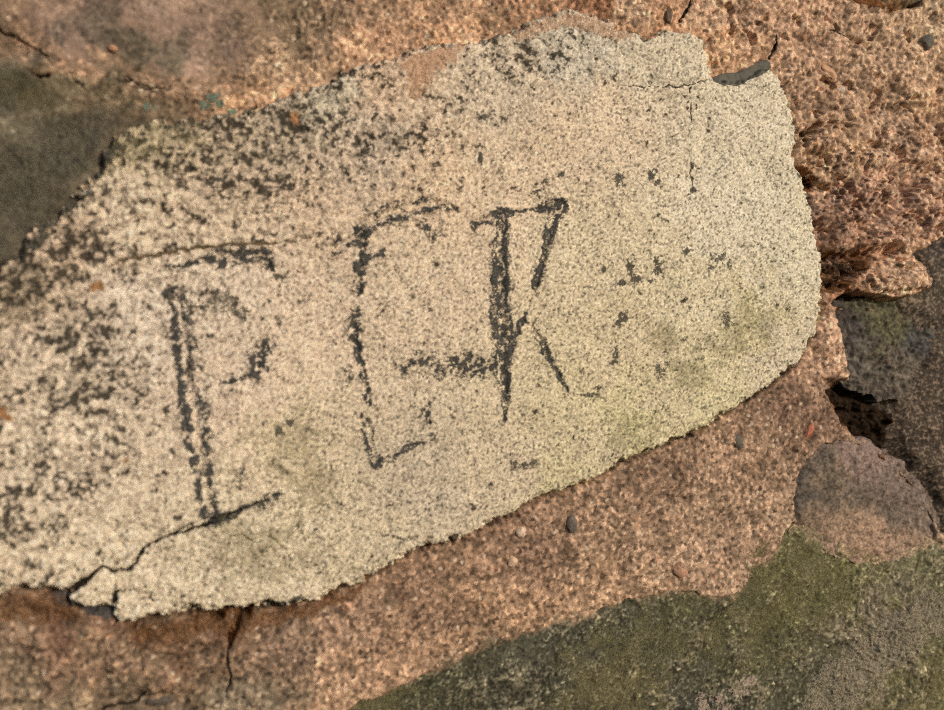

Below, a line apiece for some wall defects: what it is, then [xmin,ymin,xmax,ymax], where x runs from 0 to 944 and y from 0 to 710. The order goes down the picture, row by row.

crack [32,54,102,101]
crack [113,75,165,92]
crack [68,494,290,603]
crack [223,610,242,698]